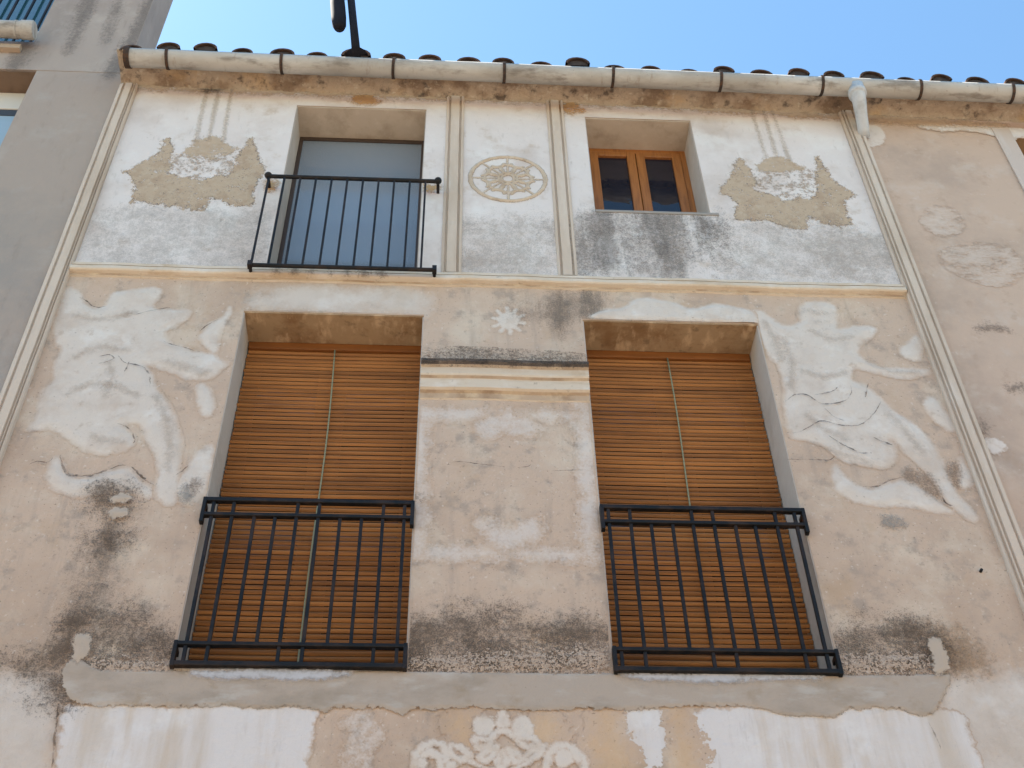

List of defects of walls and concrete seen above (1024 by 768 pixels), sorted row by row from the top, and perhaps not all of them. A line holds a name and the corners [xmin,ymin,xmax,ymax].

peeling [123,135,266,211]
peeling [719,155,856,229]
crack [30,426,146,479]
crack [793,385,892,461]
water stain [0,479,181,715]
water stain [407,598,612,674]
water stain [832,607,983,680]